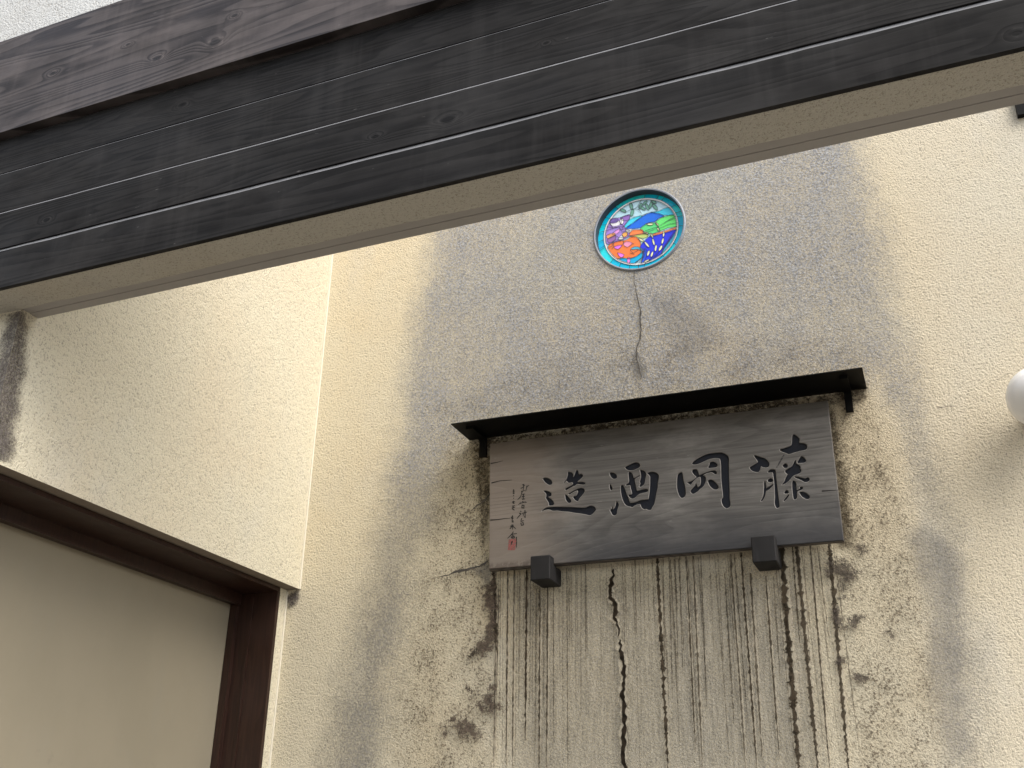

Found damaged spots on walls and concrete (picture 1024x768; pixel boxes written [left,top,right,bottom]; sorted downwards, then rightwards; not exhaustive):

water stain [0,311,28,462]
water stain [324,143,949,768]
crack [634,273,642,377]
crack [431,561,488,579]
crack [607,569,629,768]